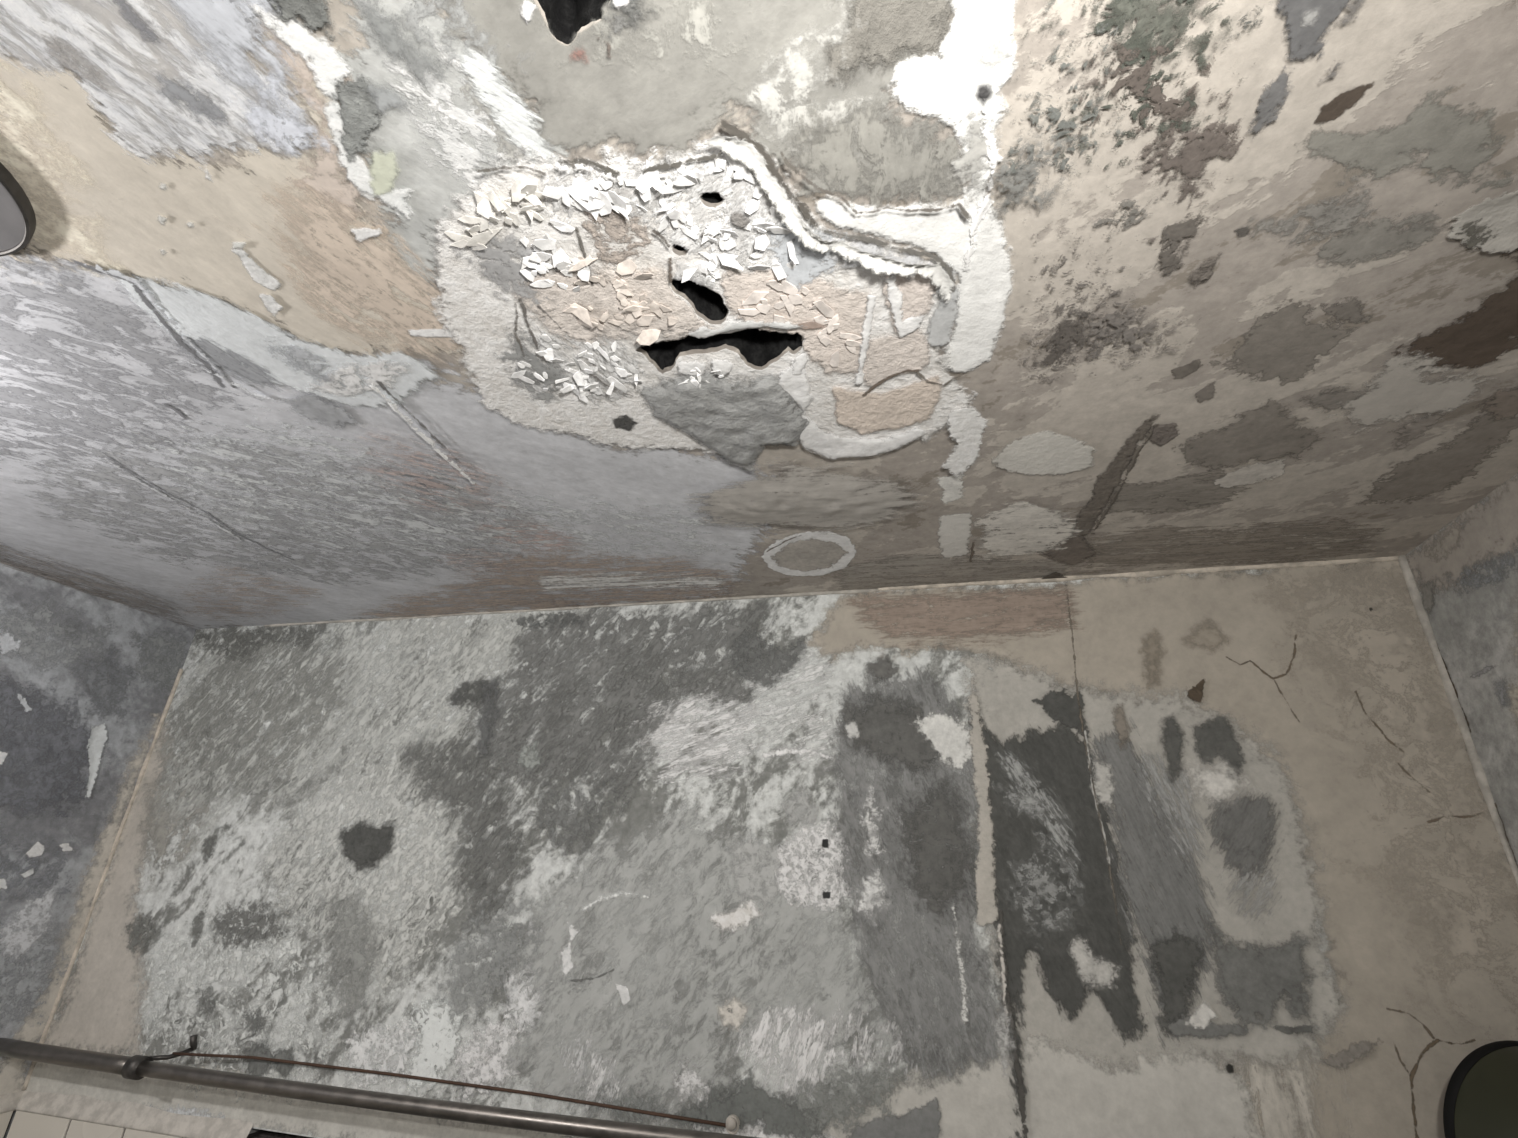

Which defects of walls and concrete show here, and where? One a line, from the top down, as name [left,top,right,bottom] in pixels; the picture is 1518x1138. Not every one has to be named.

peeling [0,0,977,672]
water stain [358,0,971,209]
spalling [977,84,992,104]
water stain [834,0,1383,591]
water stain [1243,87,1513,268]
water stain [1395,249,1518,369]
peeling [17,694,32,712]
flaking render [0,714,585,1138]
water stain [0,545,805,1104]
water stain [560,655,1315,1138]
flaking render [751,473,1518,1138]
crack [1227,635,1299,721]